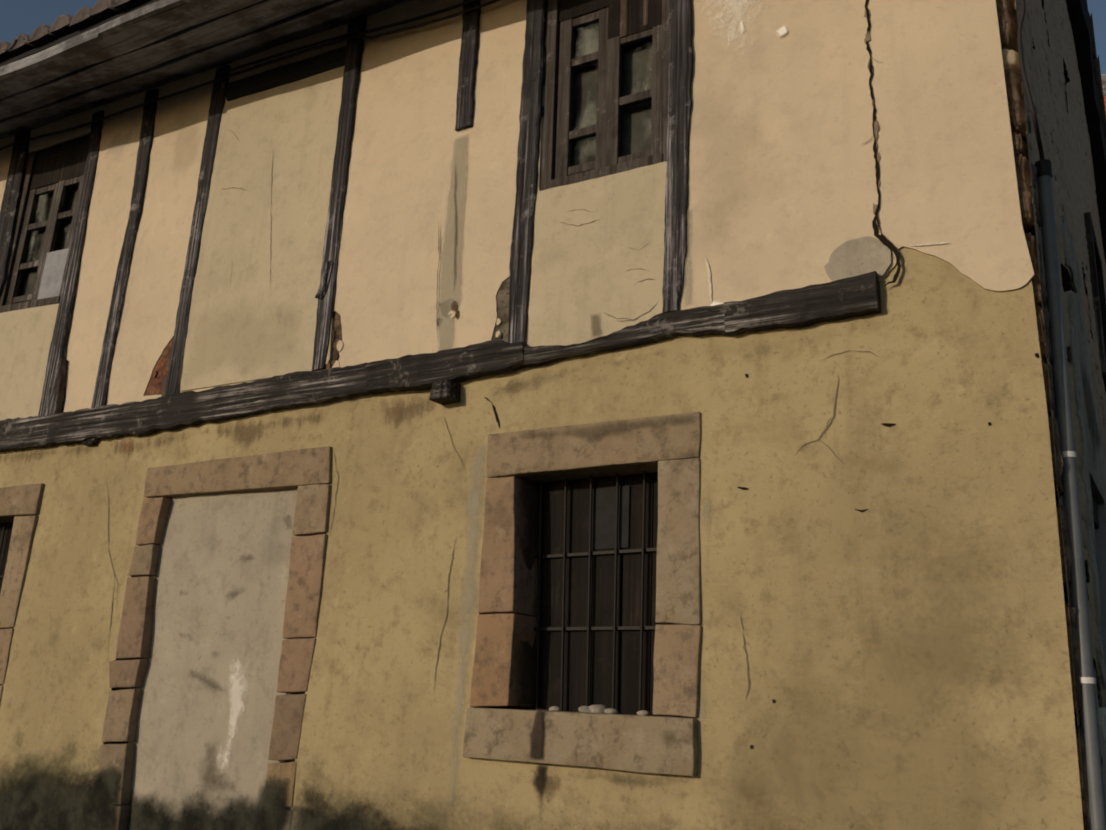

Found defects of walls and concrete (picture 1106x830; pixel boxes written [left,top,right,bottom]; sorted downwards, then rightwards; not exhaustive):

crack [863,0,901,287]
flaking render [144,337,174,396]
flaking render [325,311,344,369]
crack [796,350,879,464]
spalling [1093,647,1106,744]